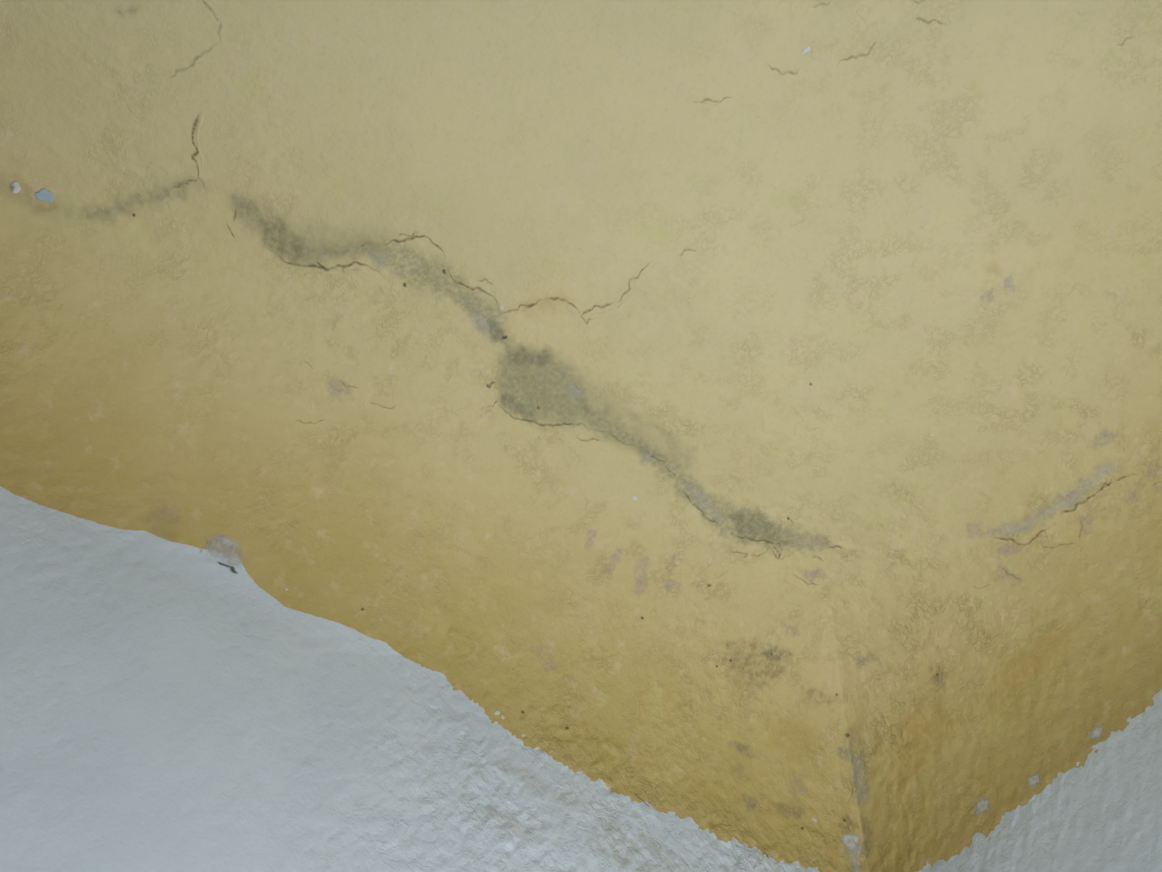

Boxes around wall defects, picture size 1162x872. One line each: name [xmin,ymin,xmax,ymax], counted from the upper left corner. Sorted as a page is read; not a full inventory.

crack [268,256,380,281]